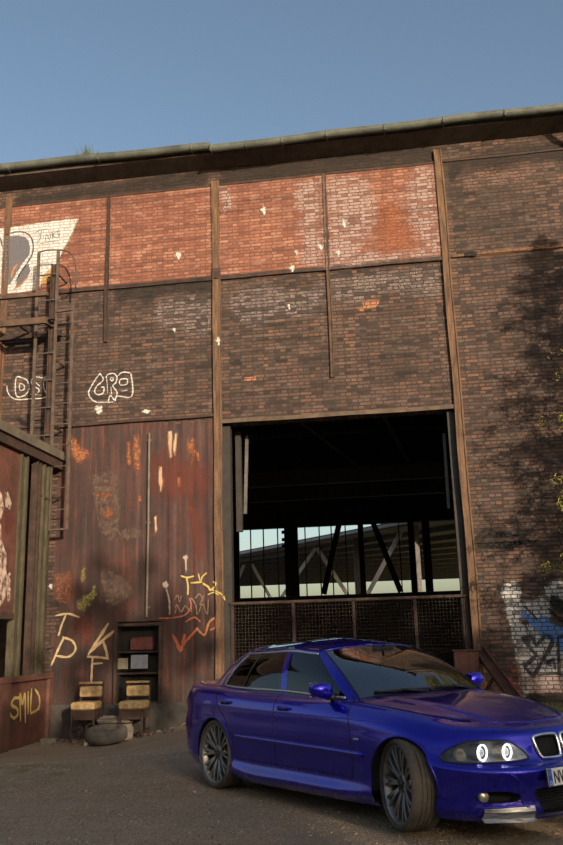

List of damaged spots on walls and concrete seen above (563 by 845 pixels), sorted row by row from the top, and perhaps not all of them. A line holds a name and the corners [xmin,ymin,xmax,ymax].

rust [65,440,88,461]
rust [168,431,177,457]
peeling [0,492,12,605]
peeling [77,569,133,609]